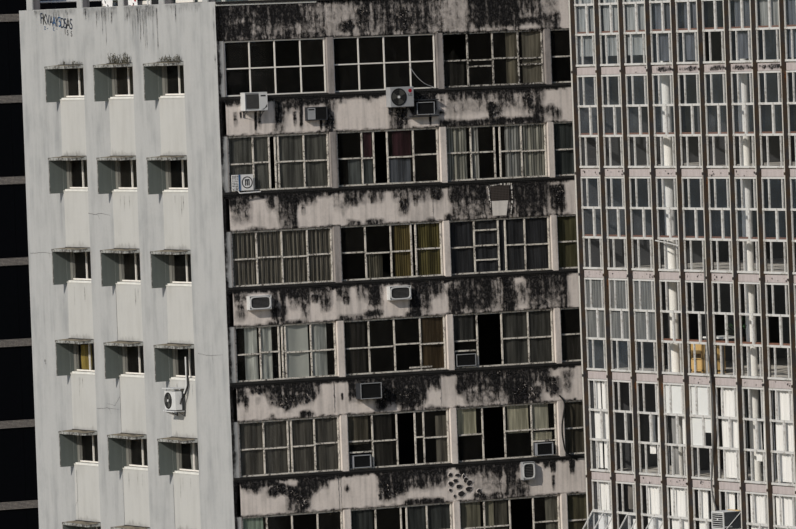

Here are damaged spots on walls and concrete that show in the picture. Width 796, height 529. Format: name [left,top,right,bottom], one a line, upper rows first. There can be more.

water stain [215,0,578,529]